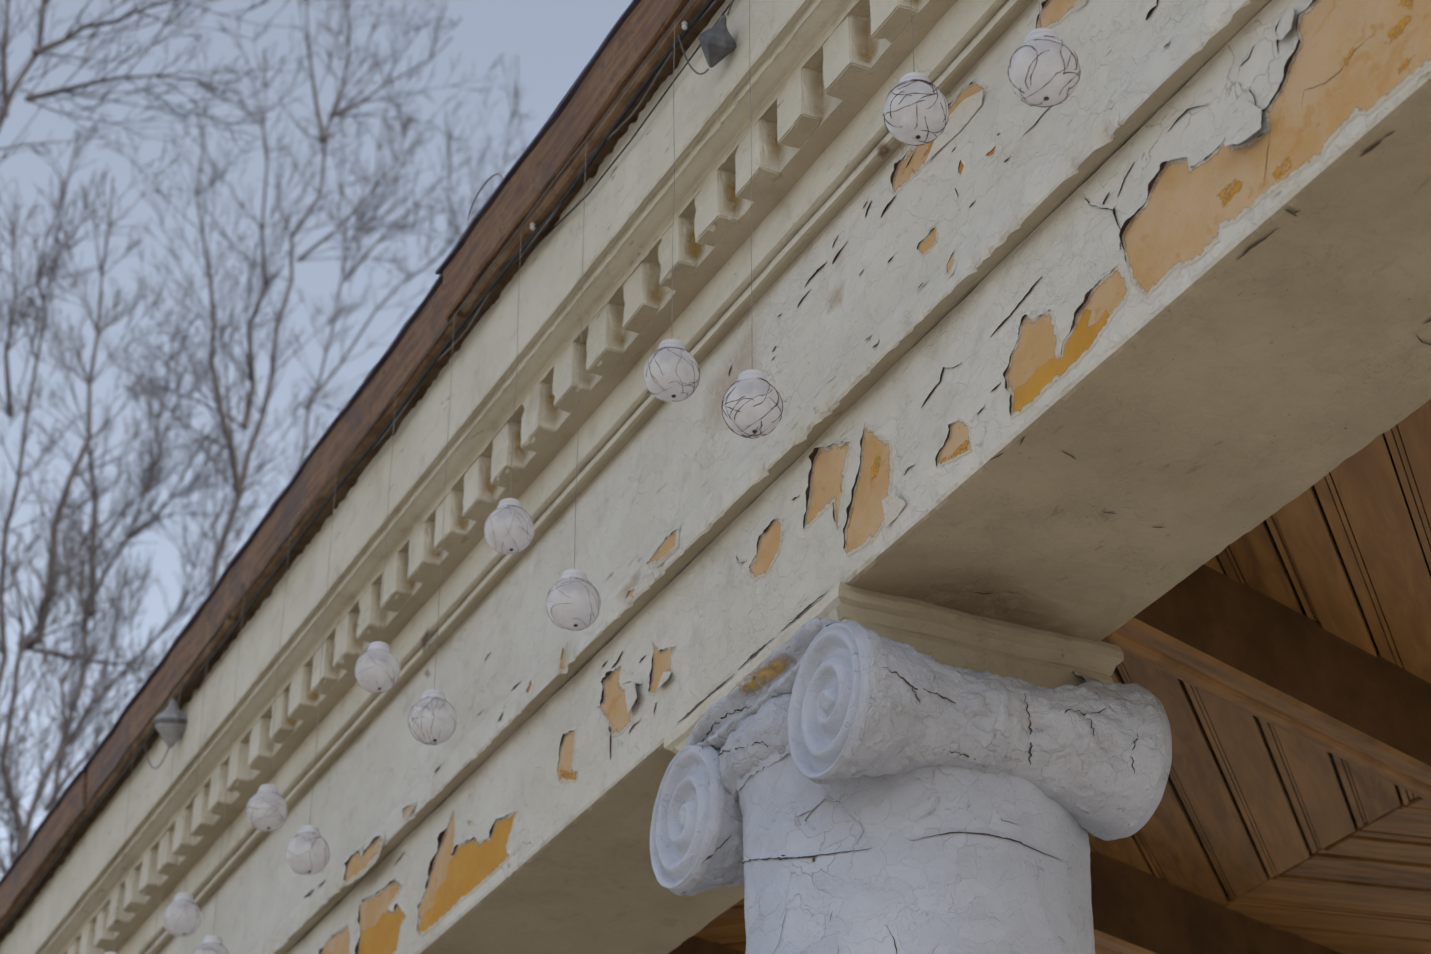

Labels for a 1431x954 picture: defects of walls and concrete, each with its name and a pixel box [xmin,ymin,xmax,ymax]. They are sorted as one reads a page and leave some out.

crack [1145,0,1170,47]
crack [1168,15,1301,260]
peeling [1003,0,1431,420]
crack [990,275,1042,337]
crack [921,361,962,407]
peeling [803,421,906,558]
peeling [935,416,973,469]
peeling [749,514,784,582]
peeling [598,639,678,738]
crack [602,594,824,761]
crack [885,667,956,703]
peeling [319,808,518,954]